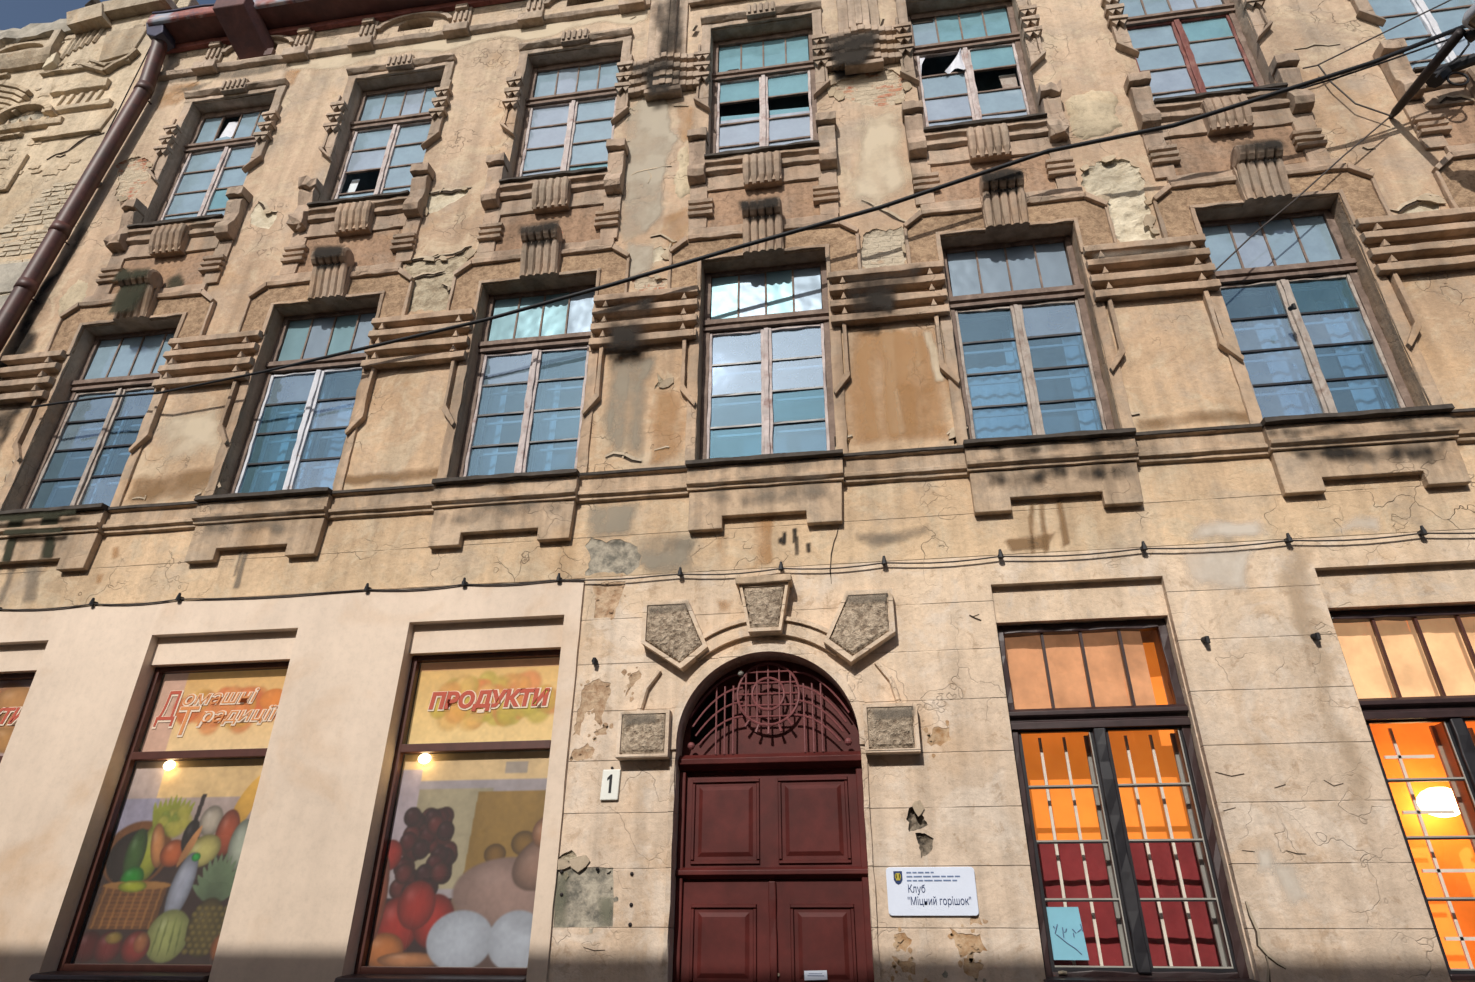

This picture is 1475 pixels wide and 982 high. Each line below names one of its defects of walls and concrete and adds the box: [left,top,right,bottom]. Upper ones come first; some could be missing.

spalling [1080,155,1160,242]
spalling [405,246,477,313]
water stain [0,406,21,443]
peeling [583,538,641,620]
spalling [906,800,934,858]
peeling [552,850,634,933]
peeling [887,915,988,982]